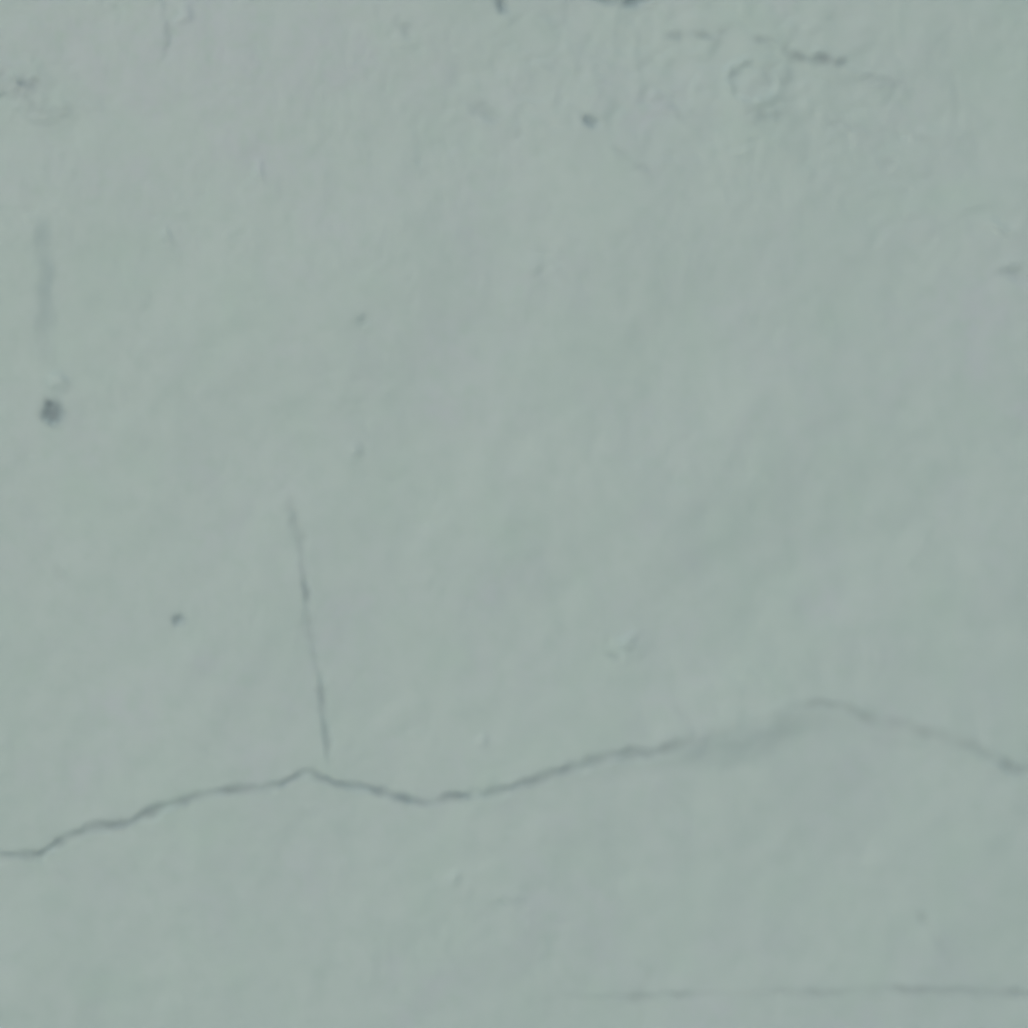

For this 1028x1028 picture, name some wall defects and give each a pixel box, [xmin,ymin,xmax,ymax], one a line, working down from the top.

crack [0,687,1028,901]